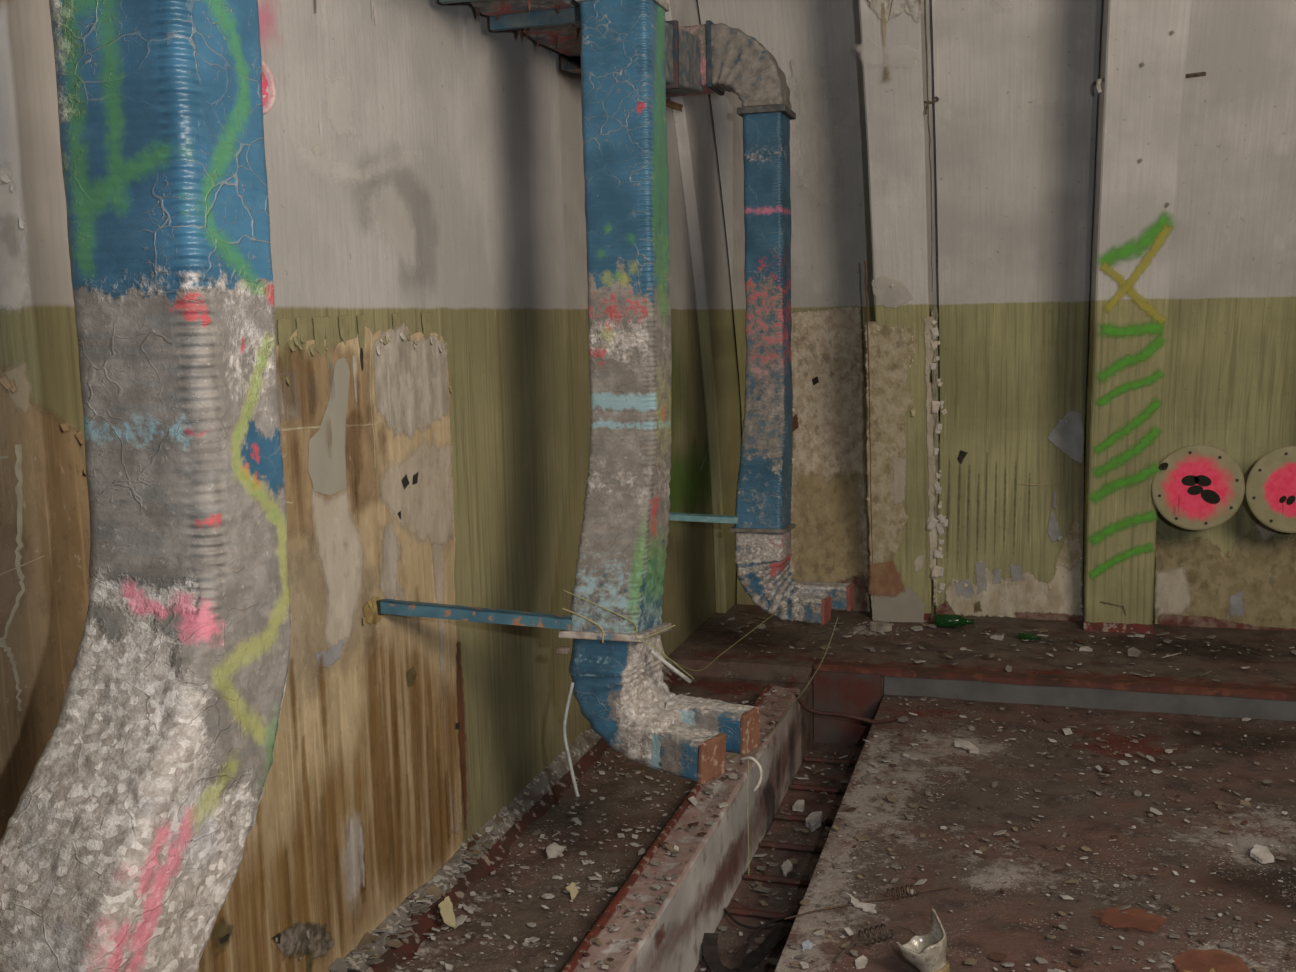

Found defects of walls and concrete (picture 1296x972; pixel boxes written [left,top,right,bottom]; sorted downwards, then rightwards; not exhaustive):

peeling [872,276,913,308]
crack [0,444,45,711]
peeling [198,312,748,972]
peeling [713,305,1296,682]